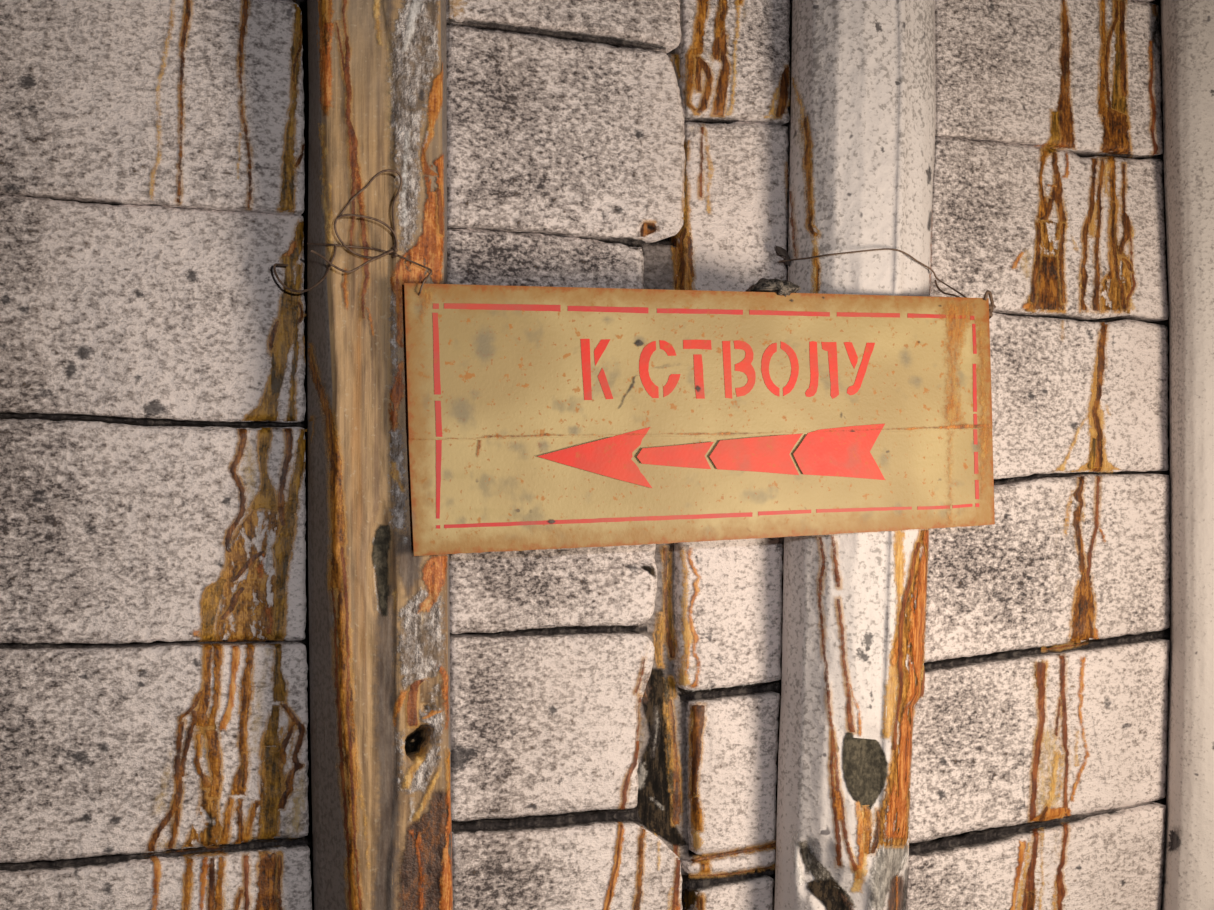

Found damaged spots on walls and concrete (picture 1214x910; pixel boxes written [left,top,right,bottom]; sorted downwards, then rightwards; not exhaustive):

rust [671,0,744,290]
rust [148,0,374,910]
rust [1011,0,1136,910]
rust [604,546,776,910]
spalling [790,831,909,910]
rust [817,529,929,892]